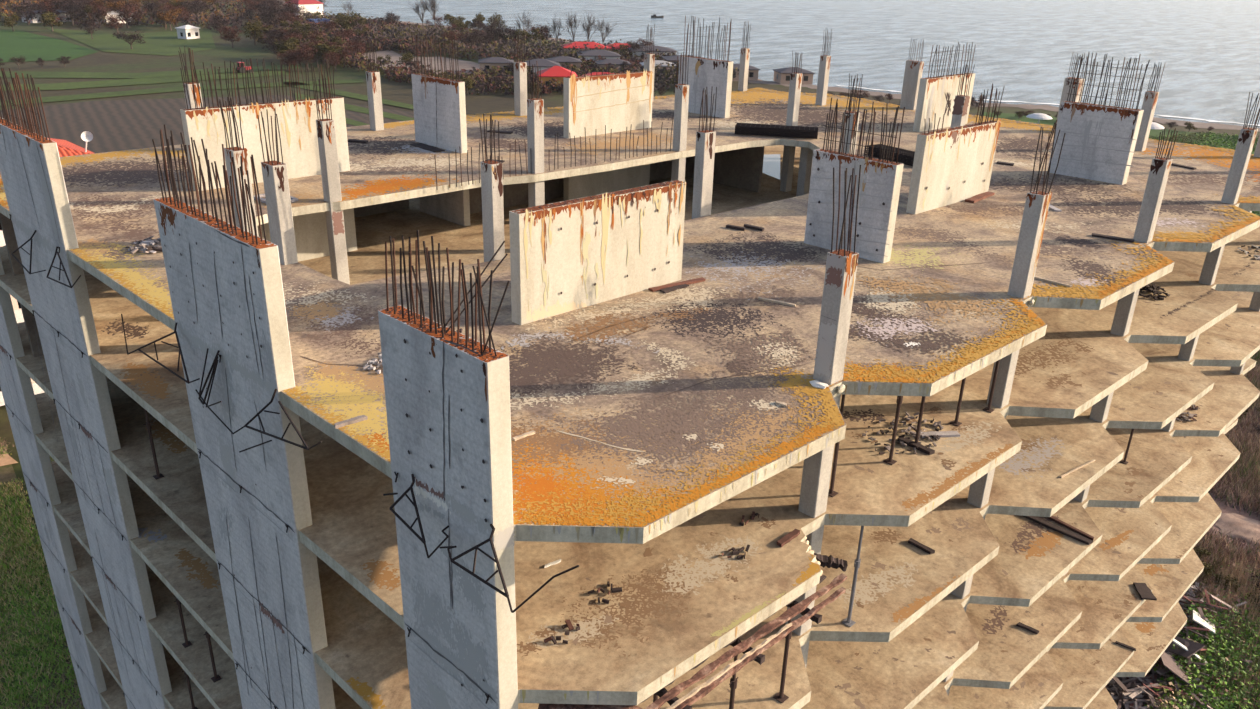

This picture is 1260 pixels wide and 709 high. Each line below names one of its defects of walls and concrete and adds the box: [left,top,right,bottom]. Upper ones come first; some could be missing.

corrosion [181,82,343,149]
corrosion [415,74,463,98]
corrosion [466,48,750,125]
corrosion [907,60,1055,172]
corrosion [482,160,503,197]
corrosion [154,197,277,268]
corrosion [511,73,1260,527]
corrosion [379,305,509,401]